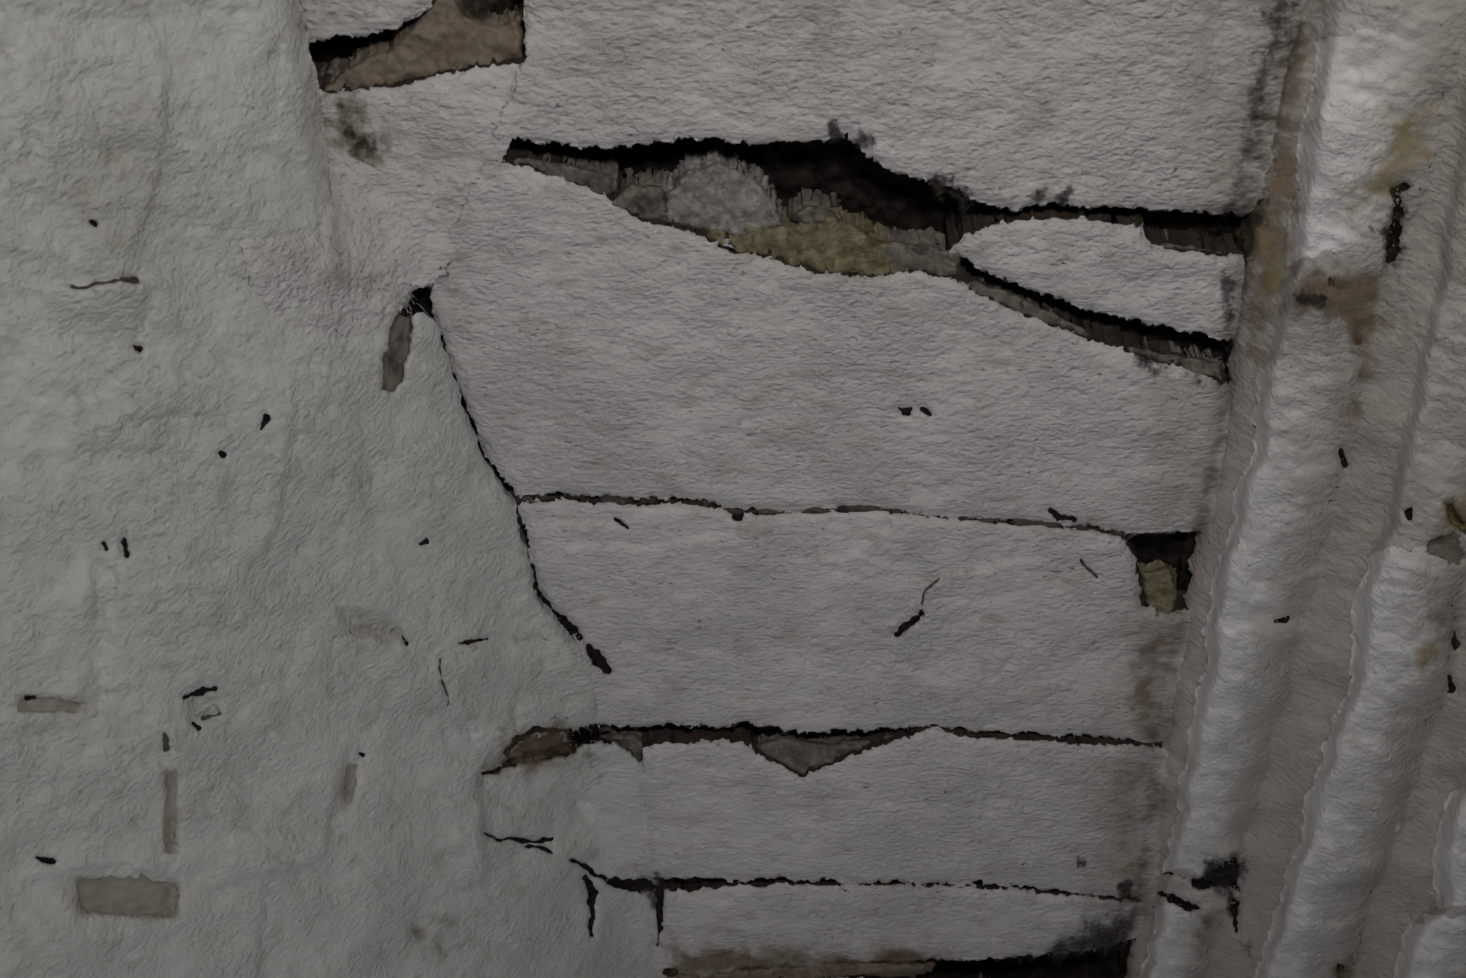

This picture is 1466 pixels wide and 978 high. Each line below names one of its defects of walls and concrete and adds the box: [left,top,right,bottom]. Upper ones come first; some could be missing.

peeling [309,0,525,92]
crack [418,287,1134,674]
peeling [1133,531,1188,617]
crack [1177,531,1196,591]
crack [438,638,489,706]
crack [481,723,699,775]
crack [741,721,893,775]
flaking render [77,873,180,917]
crack [484,832,1131,978]
crack [1158,857,1241,933]